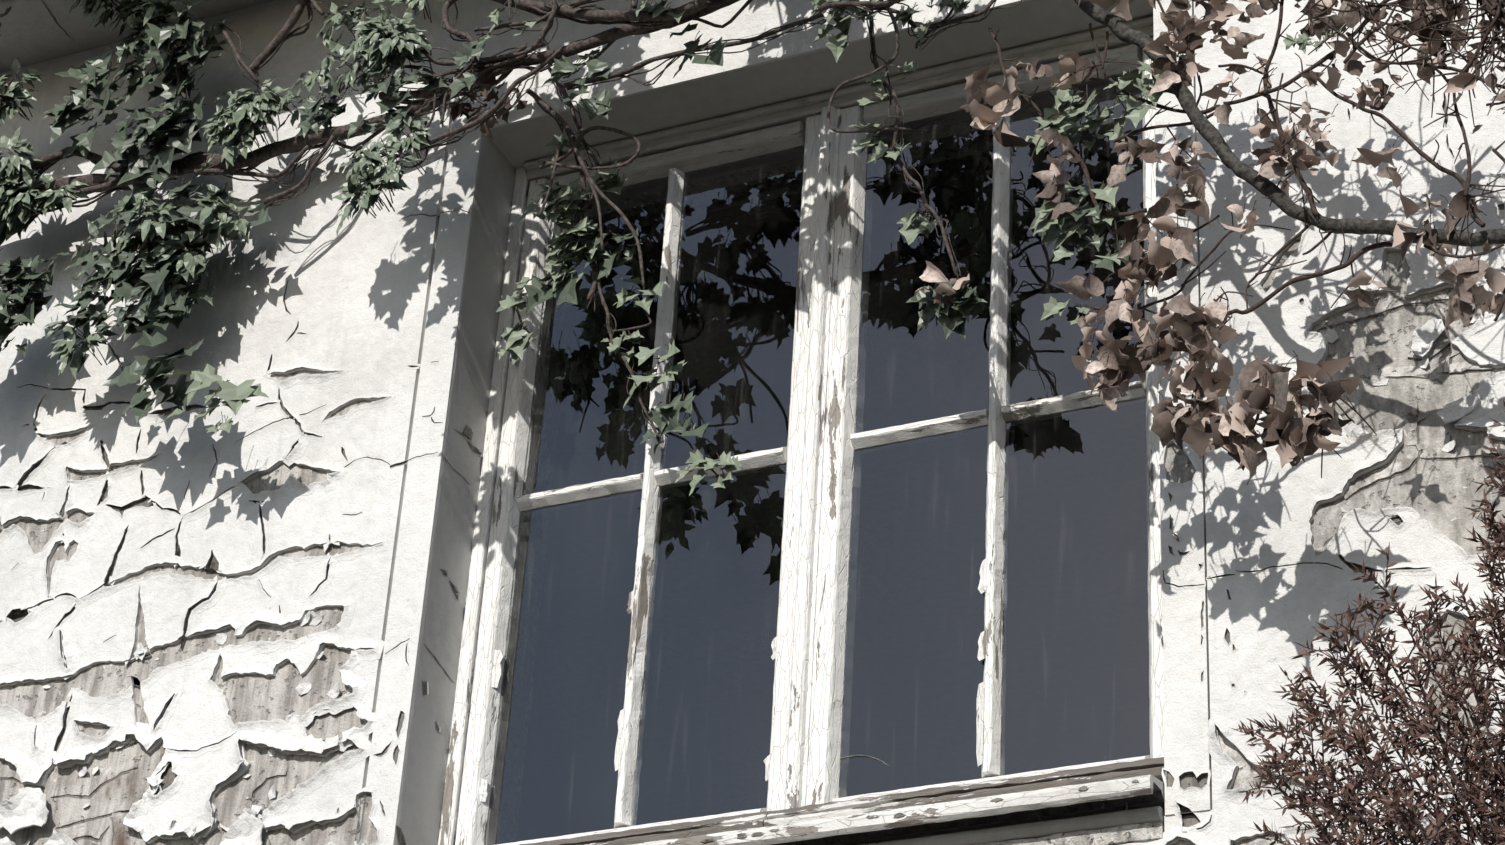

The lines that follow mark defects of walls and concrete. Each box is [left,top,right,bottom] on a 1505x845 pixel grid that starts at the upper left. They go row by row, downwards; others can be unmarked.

peeling [0,479,99,601]
crack [0,279,469,650]
peeling [180,435,348,523]
spalling [1161,439,1203,570]
peeling [1297,246,1505,565]
crack [27,690,80,763]
crack [126,676,238,758]
peeling [0,577,408,845]
crack [384,636,454,683]
peeling [614,708,625,772]
peeling [976,682,984,767]
peeling [1149,714,1342,845]